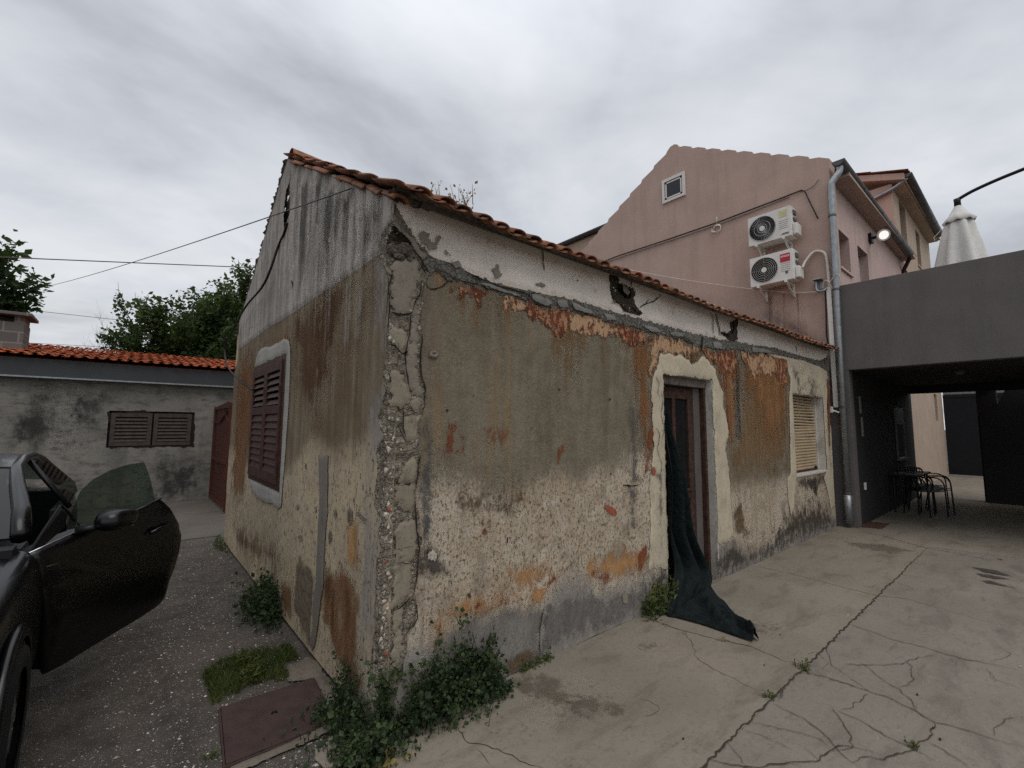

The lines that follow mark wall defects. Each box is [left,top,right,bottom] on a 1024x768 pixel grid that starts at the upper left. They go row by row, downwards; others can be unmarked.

water stain [288,183,363,266]
water stain [17,397,49,442]
flaking render [369,213,830,713]
corrosion [717,353,788,441]
corrosion [321,523,358,673]
corrosion [587,546,649,583]
corrosion [734,503,750,538]
water stain [711,473,833,580]